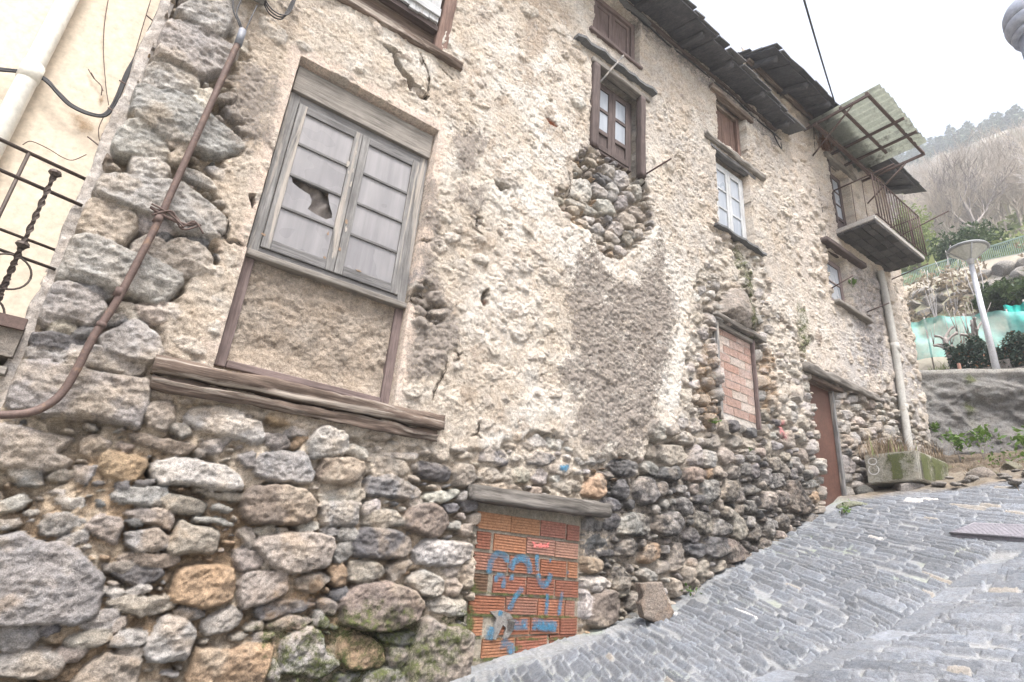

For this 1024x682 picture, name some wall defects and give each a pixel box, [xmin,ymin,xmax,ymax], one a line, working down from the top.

spalling [552,147,654,260]
spalling [679,236,772,426]